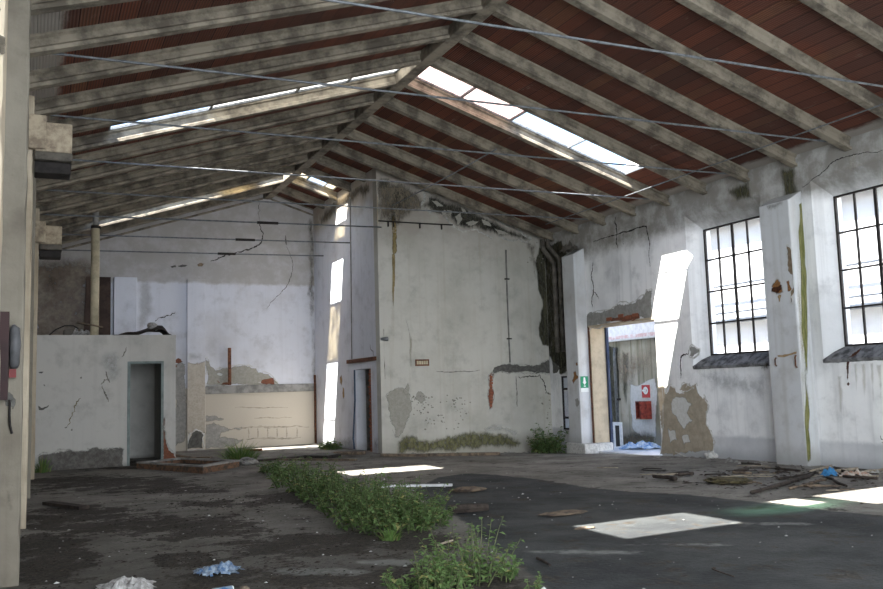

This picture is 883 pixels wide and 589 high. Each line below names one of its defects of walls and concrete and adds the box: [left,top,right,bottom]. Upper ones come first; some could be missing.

crack [212,205,264,261]
crack [593,217,650,262]
peeling [162,357,278,459]
peeling [386,384,471,438]
spalling [487,359,559,410]
spalling [587,288,716,458]